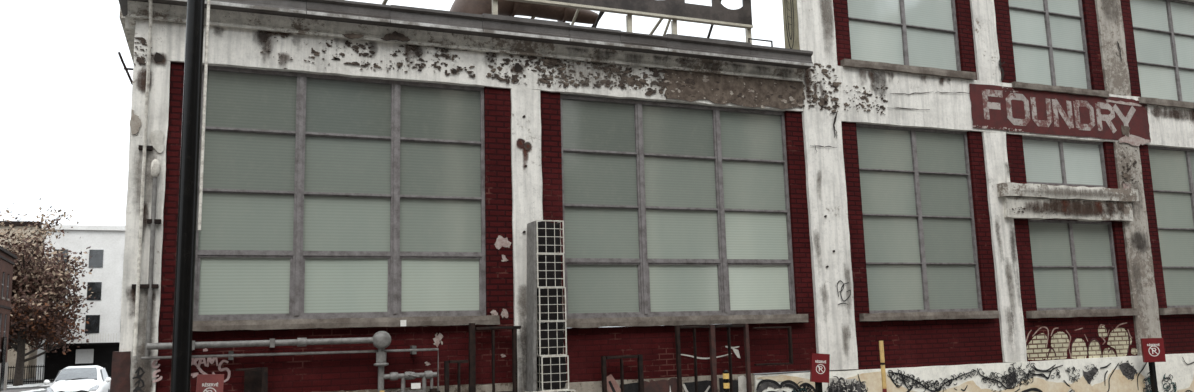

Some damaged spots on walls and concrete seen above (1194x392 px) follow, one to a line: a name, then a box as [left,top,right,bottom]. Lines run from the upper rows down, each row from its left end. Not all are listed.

peeling [134,37,166,92]
spalling [304,31,875,112]